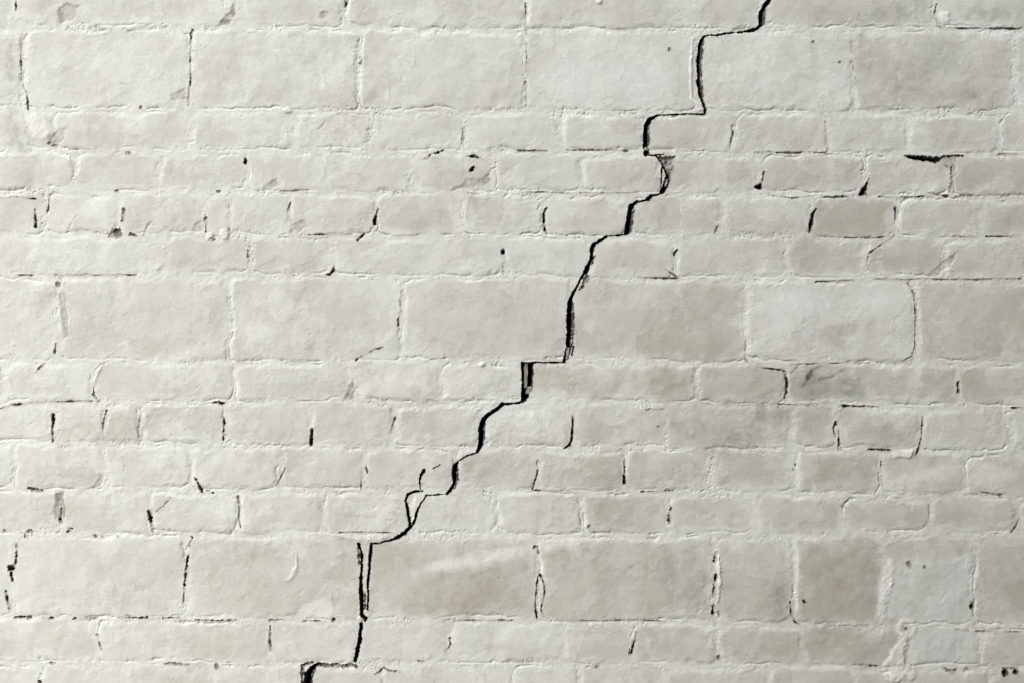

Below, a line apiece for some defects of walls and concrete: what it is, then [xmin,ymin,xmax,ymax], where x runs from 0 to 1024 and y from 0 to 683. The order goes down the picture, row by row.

crack [268,0,771,683]